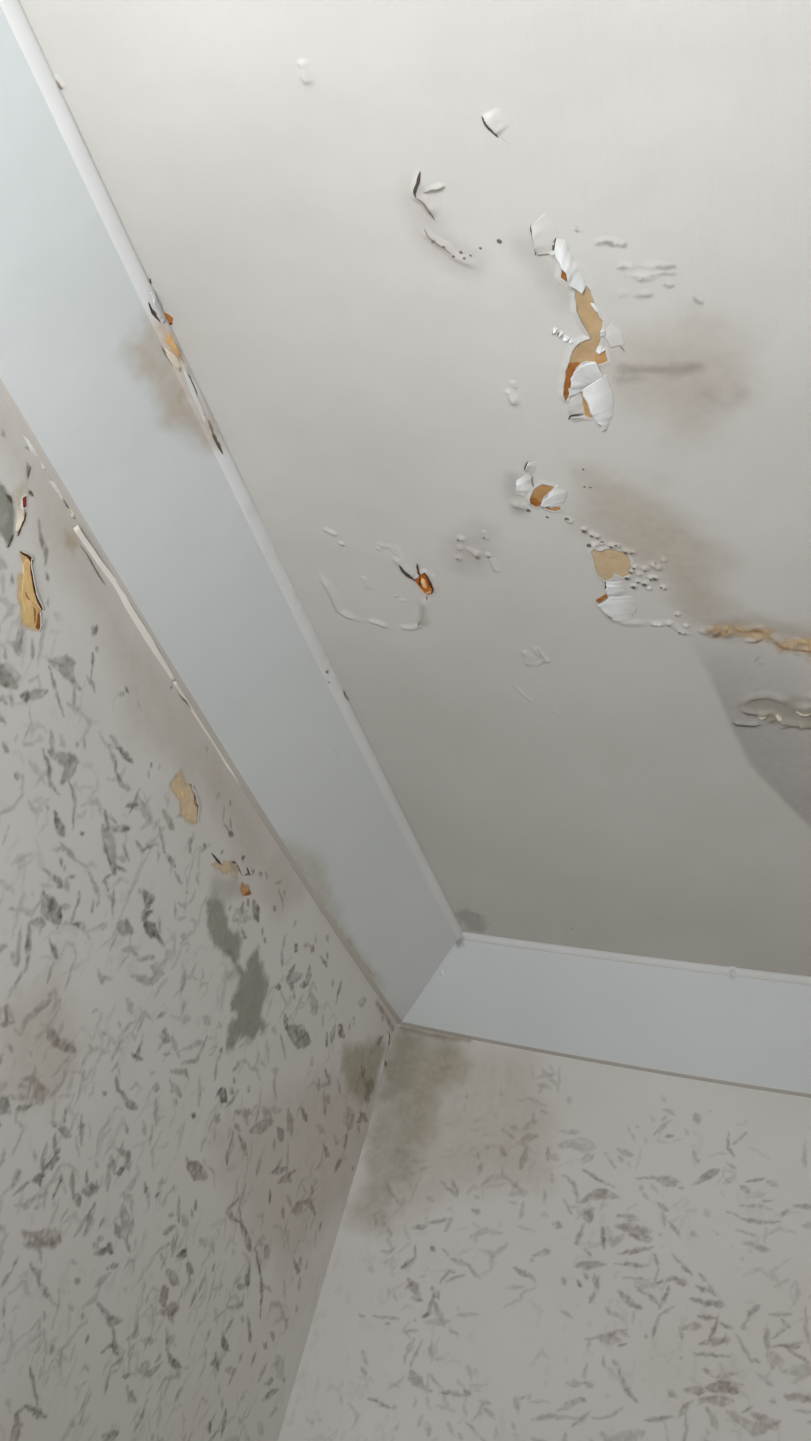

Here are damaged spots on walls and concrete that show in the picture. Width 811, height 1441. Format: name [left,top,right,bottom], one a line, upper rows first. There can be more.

peeling [530,213,625,431]
peeling [506,462,669,628]
water stain [711,623,811,683]